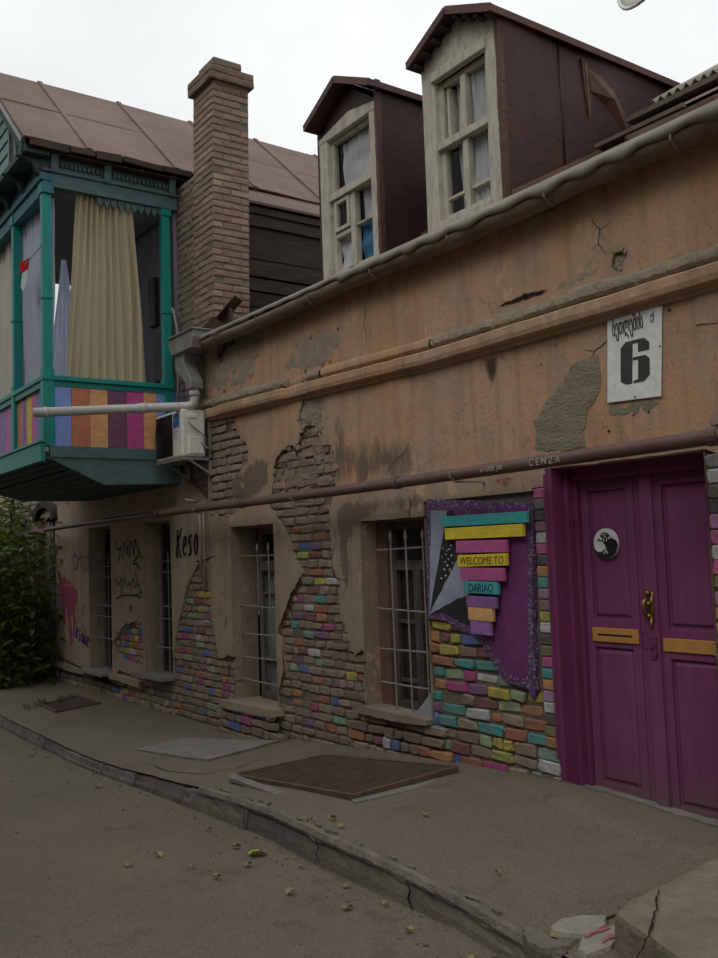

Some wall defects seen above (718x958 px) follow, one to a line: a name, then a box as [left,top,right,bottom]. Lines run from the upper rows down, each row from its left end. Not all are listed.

spalling [203,416,248,517]
spalling [272,396,338,508]
crack [636,890,659,958]